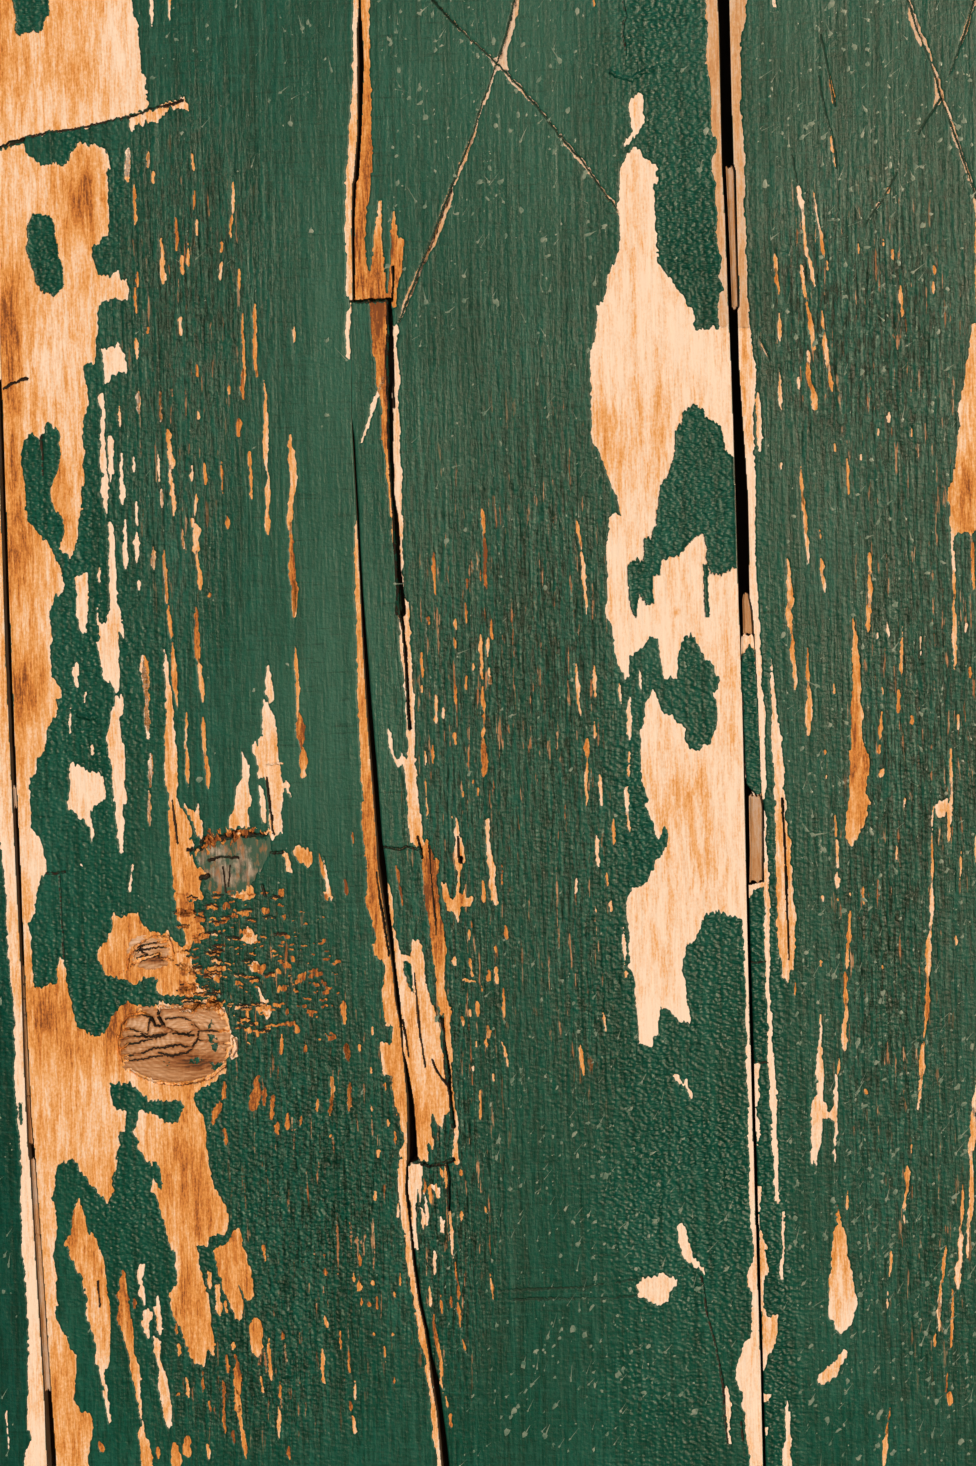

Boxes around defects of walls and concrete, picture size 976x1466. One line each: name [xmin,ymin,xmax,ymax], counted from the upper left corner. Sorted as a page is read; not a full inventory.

crack [0,98,184,148]
peeling [345,0,404,543]
peeling [947,323,976,573]
peeling [0,0,341,1466]
peeling [590,0,797,1466]
peeling [845,619,871,846]
crack [376,835,456,1212]
peeling [817,1205,858,1385]